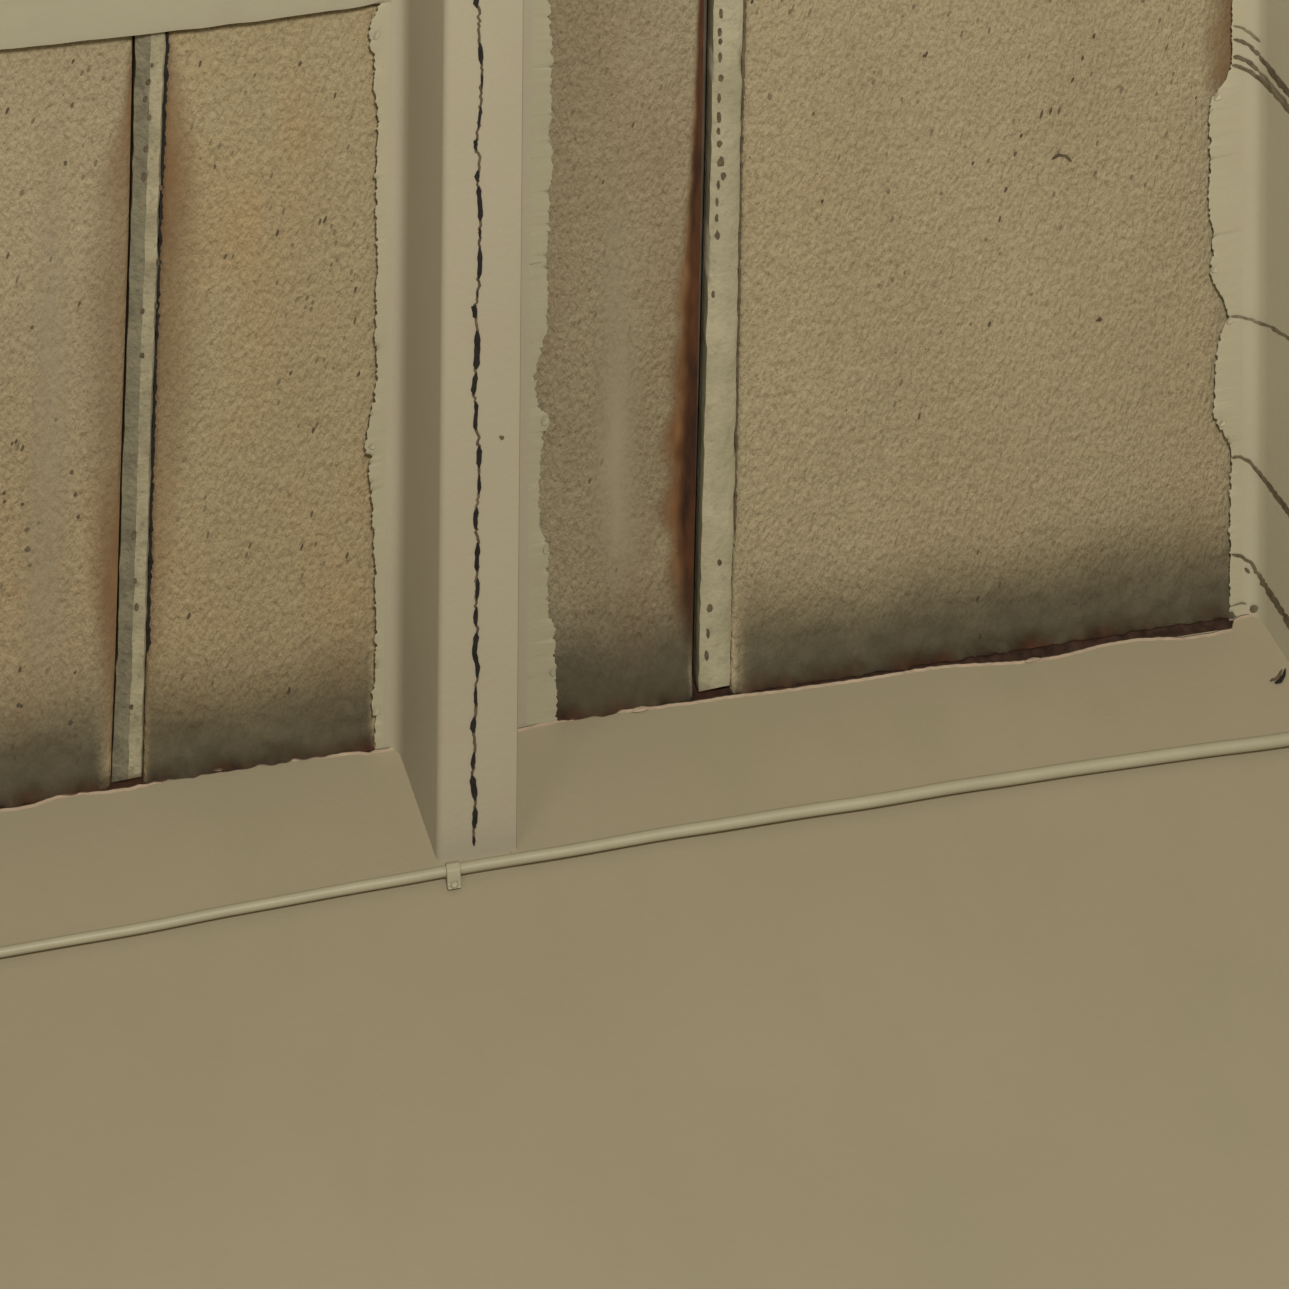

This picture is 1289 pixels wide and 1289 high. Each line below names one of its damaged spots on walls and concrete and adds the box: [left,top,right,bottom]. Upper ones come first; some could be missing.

crack [1232,25,1289,114]
corrosion [666,0,704,624]
crack [1231,315,1289,341]
crack [469,0,484,846]
peeling [511,0,1289,854]
peeling [0,2,463,947]
crack [1232,455,1289,517]
water stain [745,566,1236,693]
crack [1231,554,1289,629]
water stain [555,641,689,718]
water stain [0,738,100,807]
water stain [149,695,370,782]